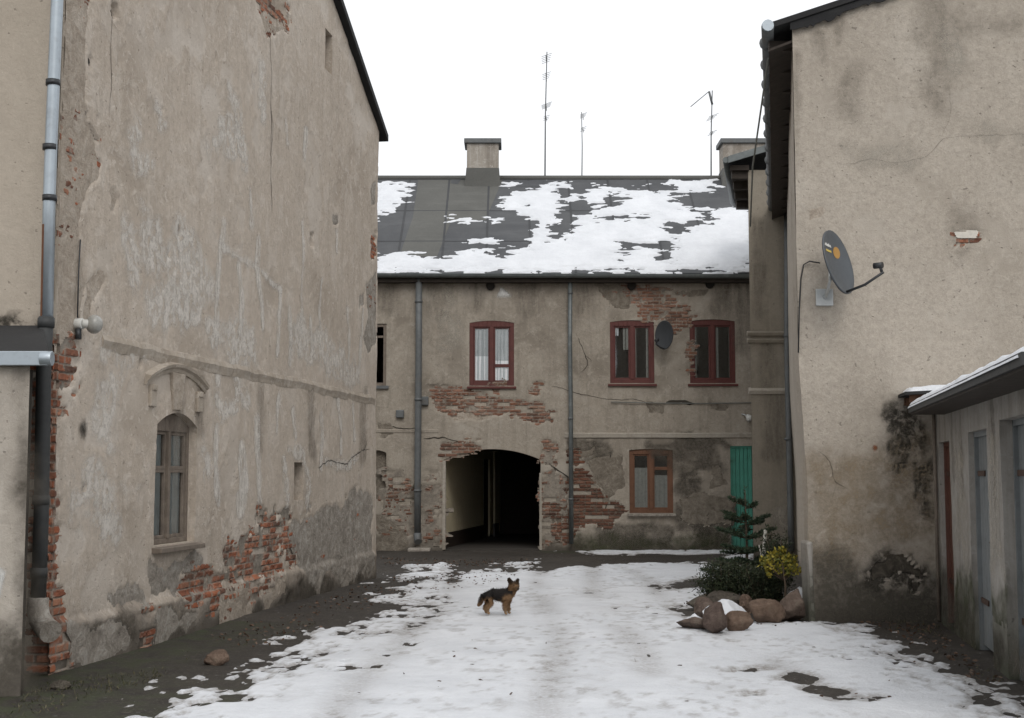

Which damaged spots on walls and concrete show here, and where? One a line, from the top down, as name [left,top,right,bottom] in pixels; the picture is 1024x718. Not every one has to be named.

flaking render [25,0,454,675]
damp [121,189,364,386]
flaking render [594,283,709,376]
flaking render [950,230,982,247]
flaking render [429,378,557,425]
flaking render [536,439,629,549]
damp [811,397,974,647]
flaking render [870,554,924,591]